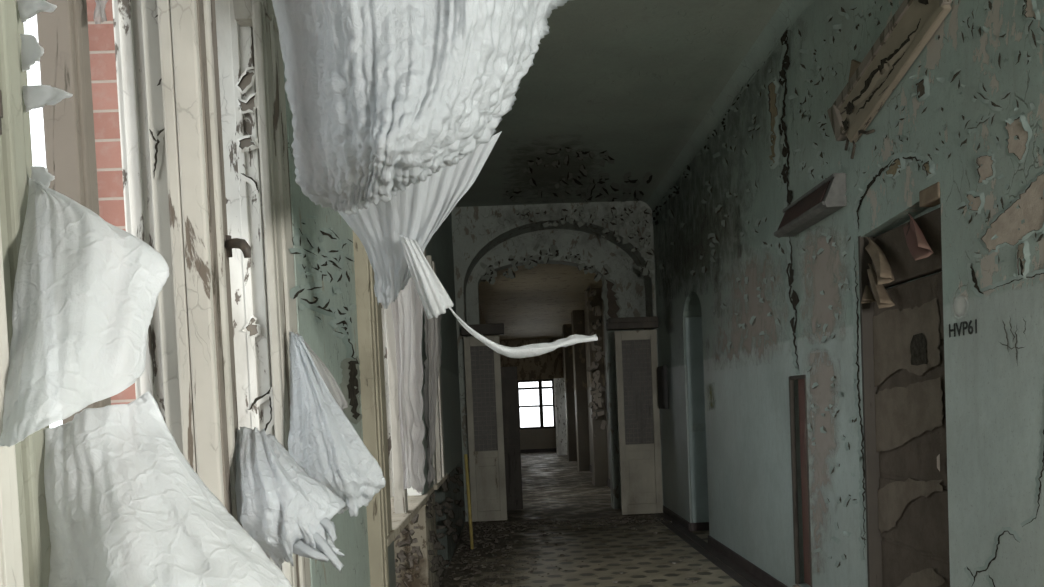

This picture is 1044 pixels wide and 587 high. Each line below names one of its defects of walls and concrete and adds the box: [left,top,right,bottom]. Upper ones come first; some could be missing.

peeling [766,1,892,181]
peeling [955,0,1044,71]
crack [778,30,800,374]
peeling [480,242,622,437]
crack [964,384,1044,587]